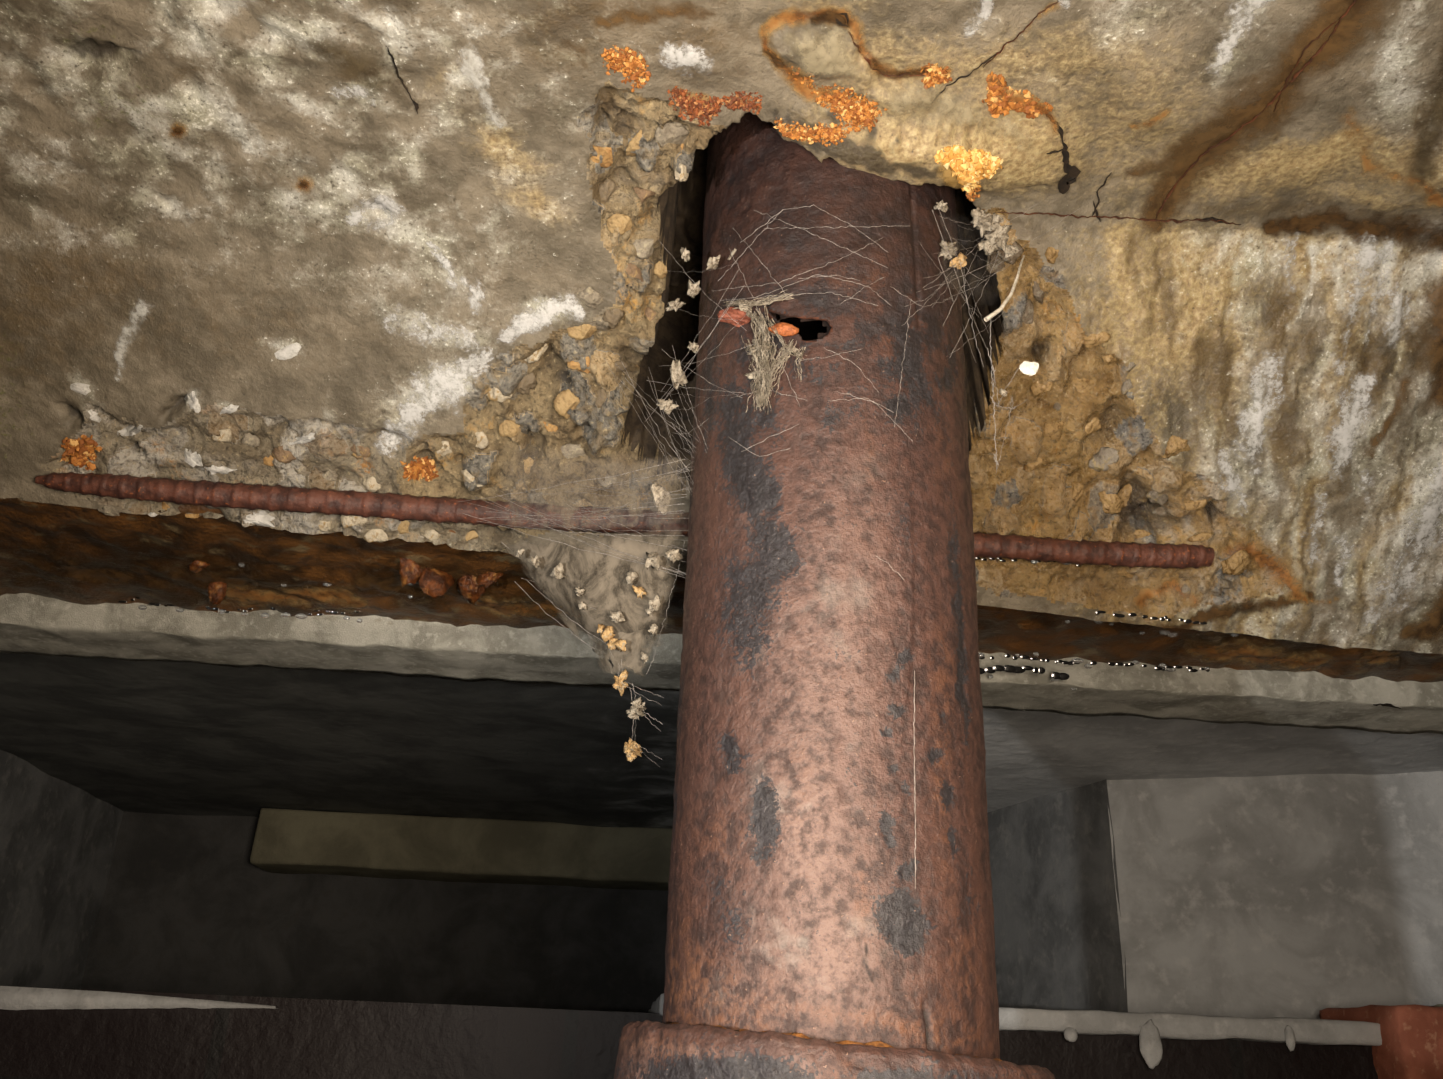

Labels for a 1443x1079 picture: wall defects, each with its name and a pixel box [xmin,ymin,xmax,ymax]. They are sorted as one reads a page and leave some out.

rust [601,45,651,92]
rust [759,7,953,147]
water stain [965,0,993,35]
crack [936,0,1069,99]
rust [982,72,1058,133]
crack [997,0,1356,225]
rust [934,145,1003,201]
rust [768,322,799,336]
spalling [955,188,1285,623]
water stain [1218,357,1282,507]
water stain [1326,361,1376,473]
water stain [1366,465,1443,623]